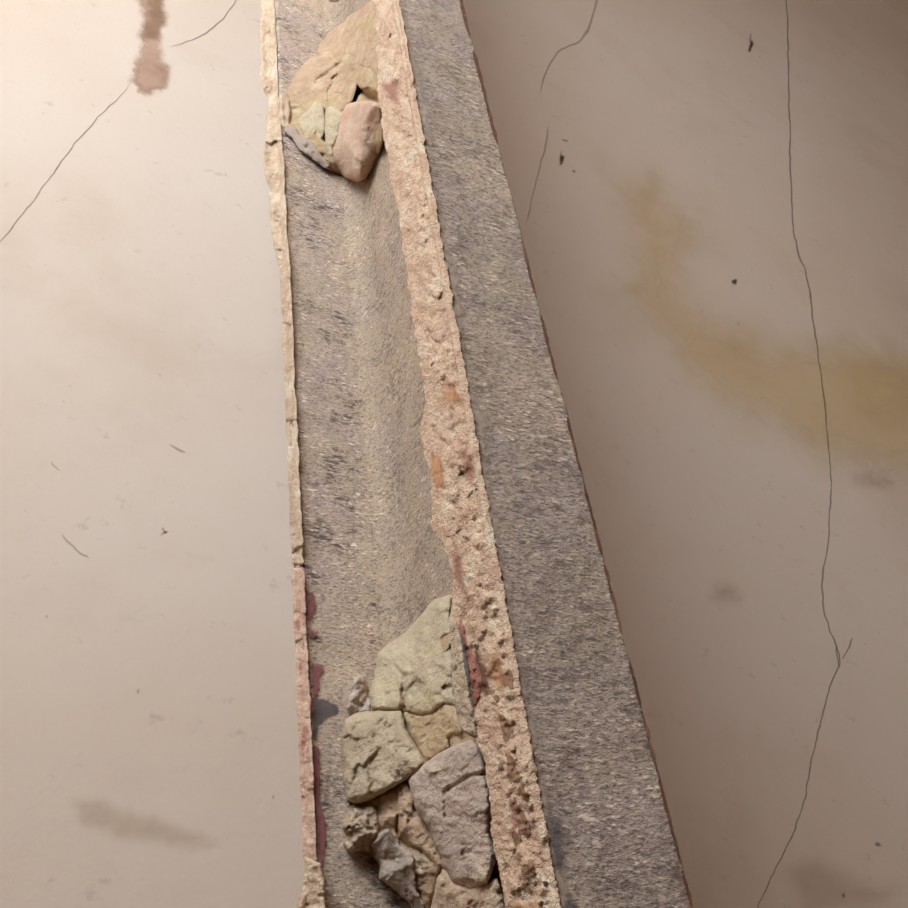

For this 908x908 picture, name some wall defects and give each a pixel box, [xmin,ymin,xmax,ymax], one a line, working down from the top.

spalling [278,93,342,170]
peeling [291,567,326,865]
spalling [461,635,473,717]
spalling [499,715,512,741]
spalling [499,669,513,688]
spalling [498,756,535,889]
peeling [371,828,425,908]